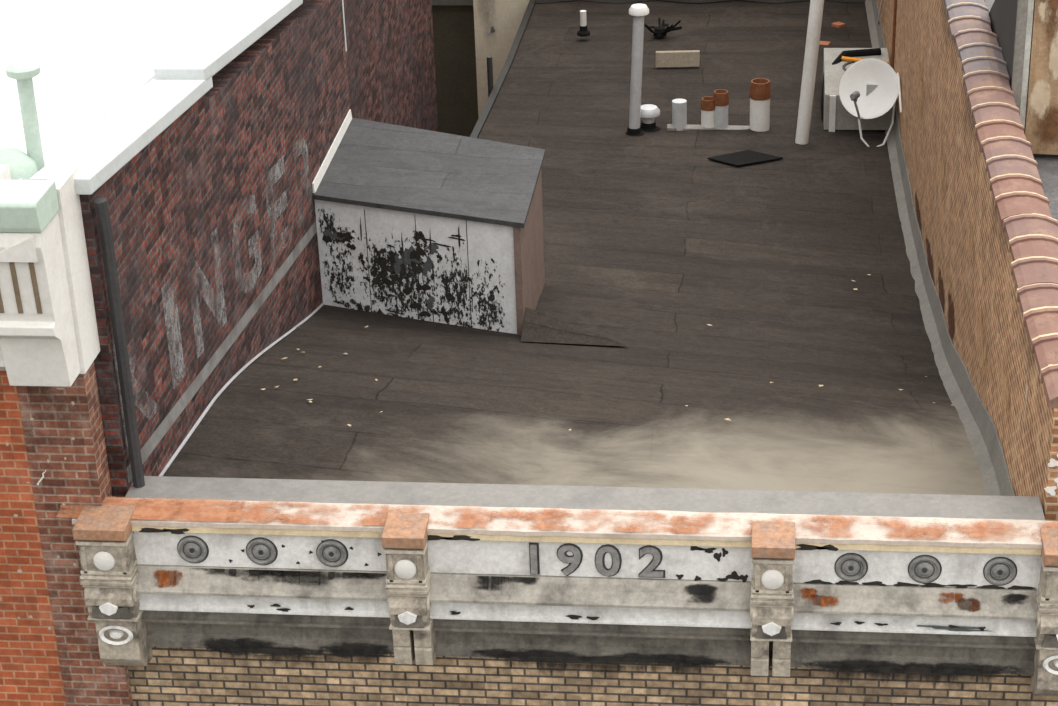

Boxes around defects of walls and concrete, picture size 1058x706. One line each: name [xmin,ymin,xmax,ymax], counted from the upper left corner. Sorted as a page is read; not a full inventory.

peeling [318,208,510,332]
peeling [102,496,338,534]
peeling [354,504,429,526]
peeling [427,507,729,562]
peeling [795,515,858,551]
peeling [879,518,1015,540]
peeling [717,571,748,582]
rust [801,588,838,607]
rust [939,593,980,612]
rust [1004,594,1029,604]